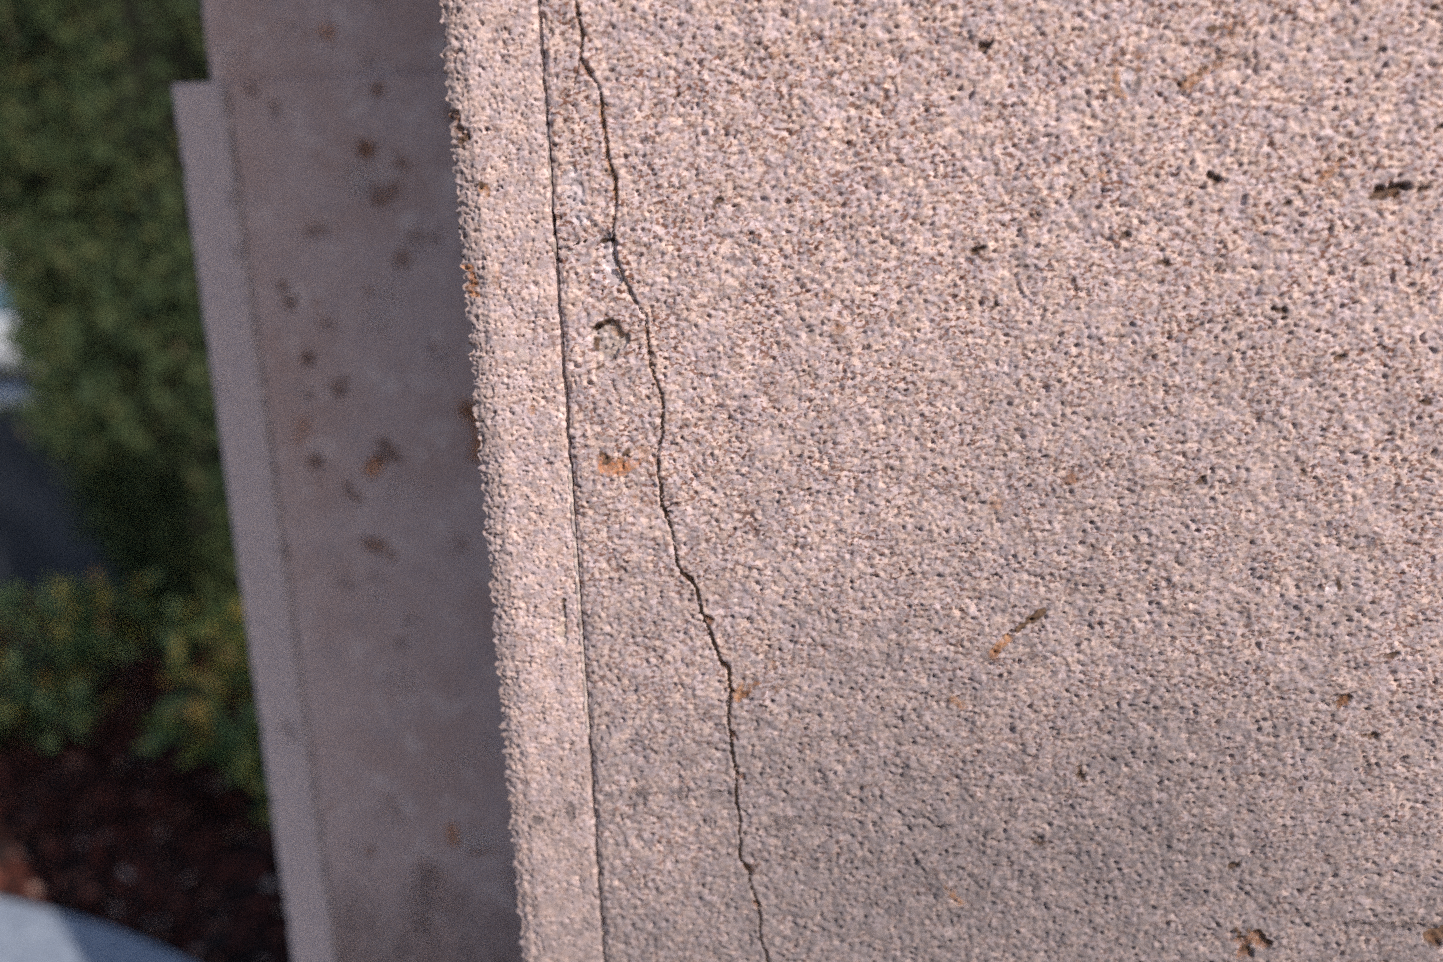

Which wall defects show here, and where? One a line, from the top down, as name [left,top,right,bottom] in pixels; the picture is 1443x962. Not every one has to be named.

corrosion [598,440,640,475]
crack [566,0,769,962]
corrosion [990,608,1047,657]